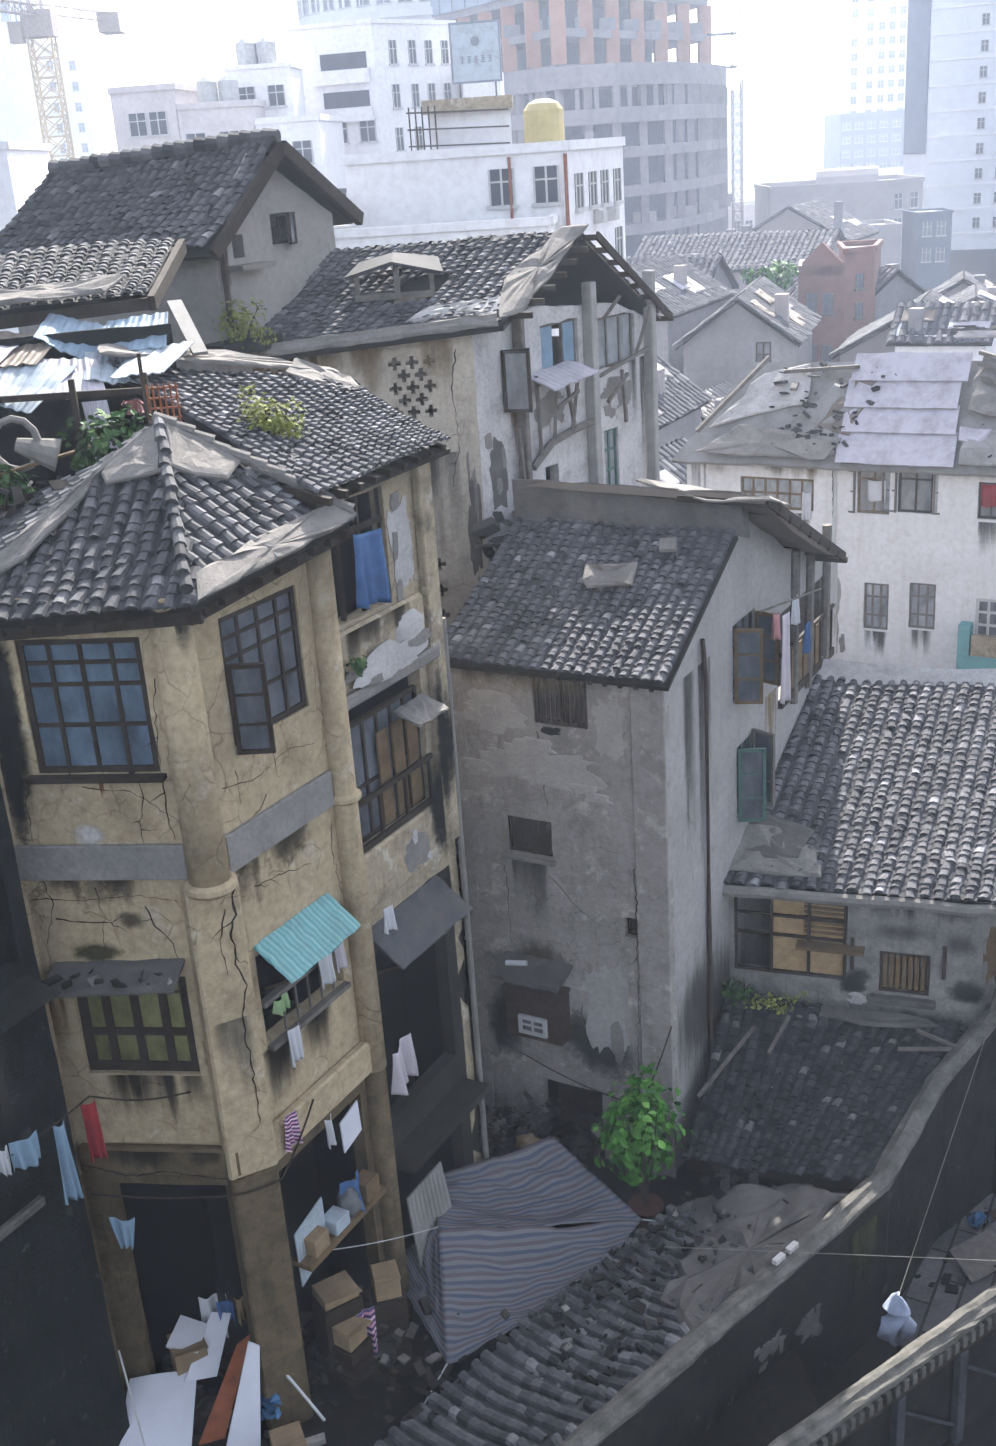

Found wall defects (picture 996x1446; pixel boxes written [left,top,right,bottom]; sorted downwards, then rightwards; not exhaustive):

crack [445,349,460,487]
spalling [386,490,414,603]
spalling [345,627,433,707]
water stain [0,646,31,828]
crack [82,678,180,843]
crack [222,743,314,817]
spalling [463,689,625,804]
crack [31,881,183,958]
crack [215,824,343,1121]
water stain [110,1075,200,1095]
water stain [567,1016,630,1070]
spalling [754,1303,823,1374]